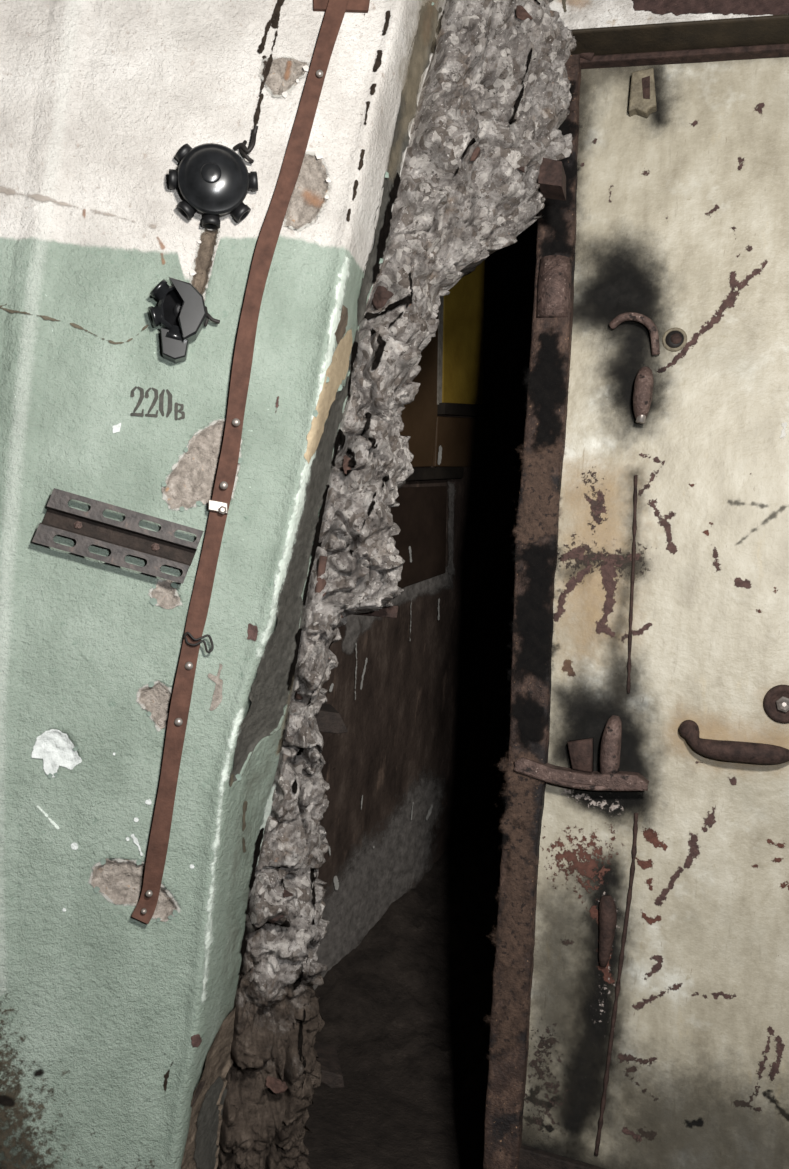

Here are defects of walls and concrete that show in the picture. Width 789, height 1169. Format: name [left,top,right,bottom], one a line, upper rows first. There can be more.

peeling [632,0,789,16]
crack [0,186,114,216]
crack [150,224,165,264]
crack [0,304,148,344]
flaking render [161,419,226,511]
spalling [177,0,577,1169]
rust [514,442,652,643]
rust [638,453,678,555]
flaking render [31,729,82,779]
rust [635,807,716,925]
rust [490,751,625,1142]
leakage [0,1009,83,1169]